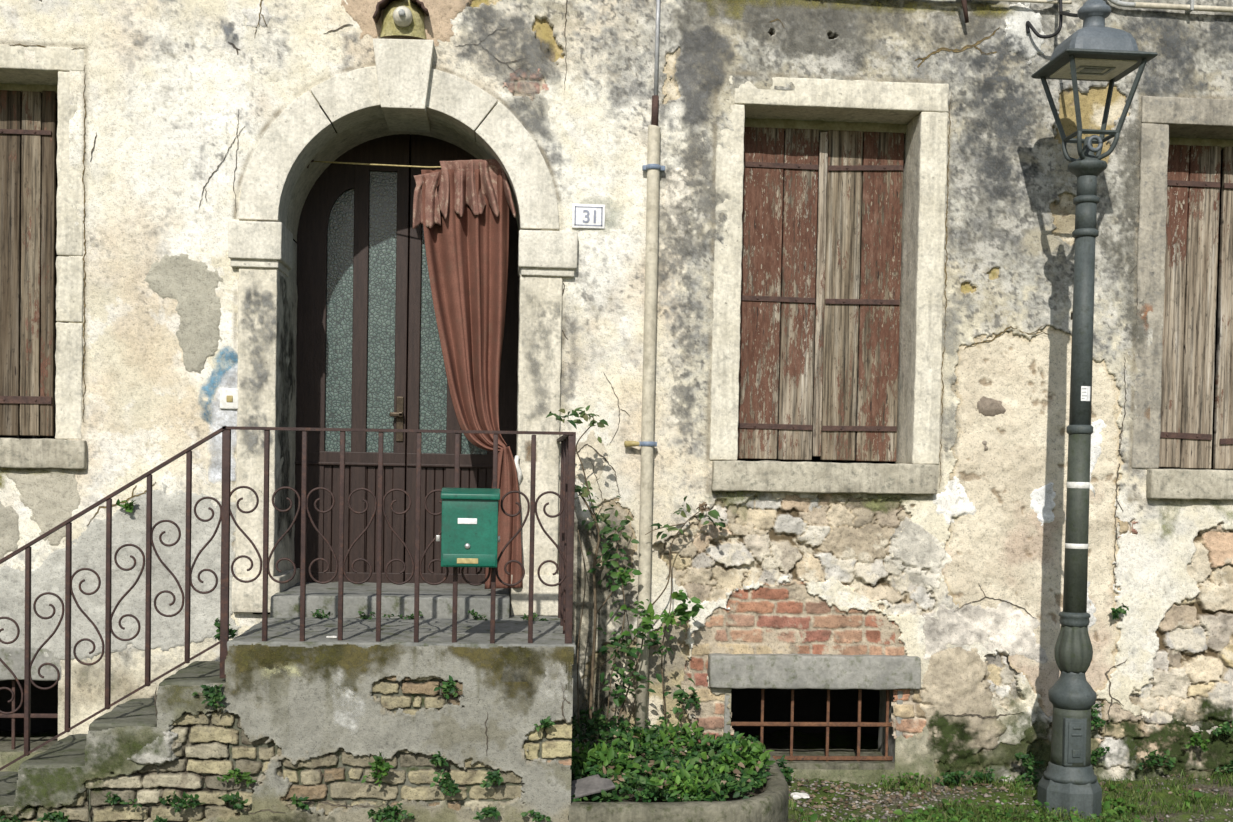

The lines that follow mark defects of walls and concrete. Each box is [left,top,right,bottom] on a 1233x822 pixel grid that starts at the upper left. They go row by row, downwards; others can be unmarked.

flaking render [503,17,565,101]
crack [915,27,1000,67]
crack [199,110,245,212]
peeling [1052,83,1131,163]
peeling [941,325,1072,718]
peeling [1085,359,1138,692]
flaking render [372,676,463,715]
flaking render [522,578,906,765]
flaking render [891,689,927,739]
flaking render [0,710,523,822]